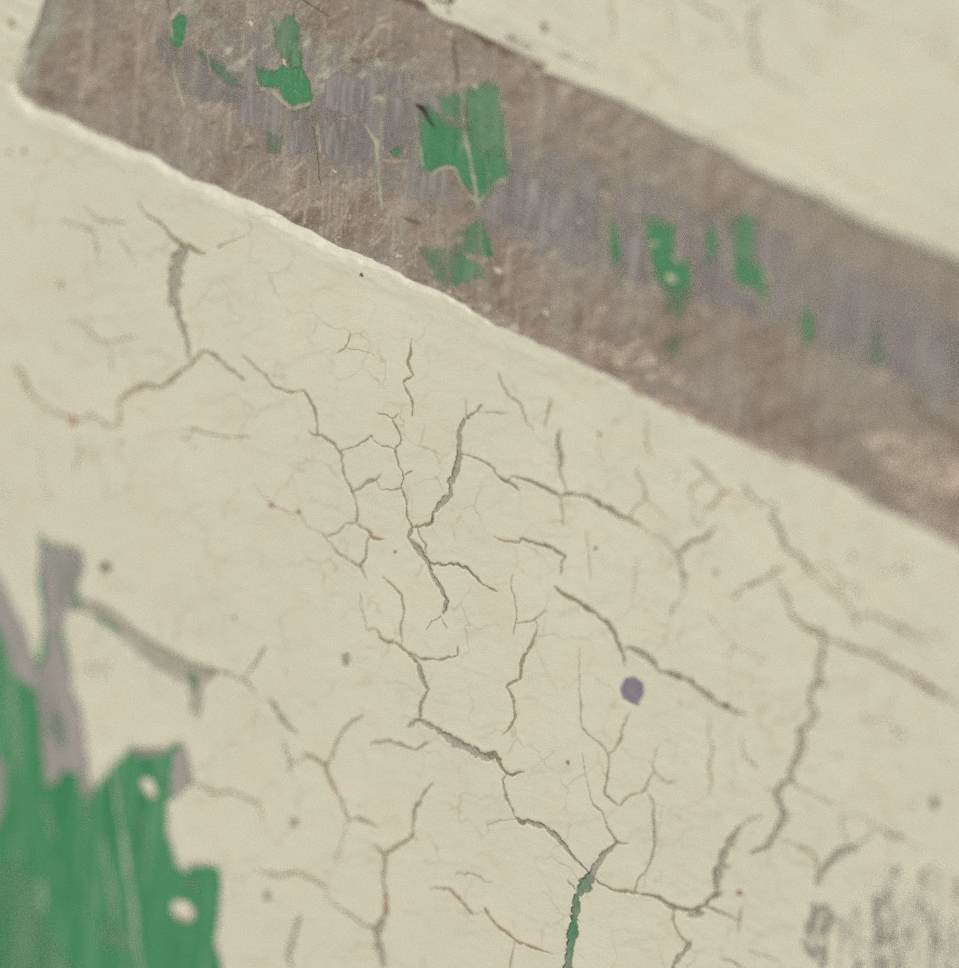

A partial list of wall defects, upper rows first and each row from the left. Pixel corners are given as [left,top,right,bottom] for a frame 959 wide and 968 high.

crack [431,0,454,15]
peeling [0,535,221,968]
crack [14,201,959,968]